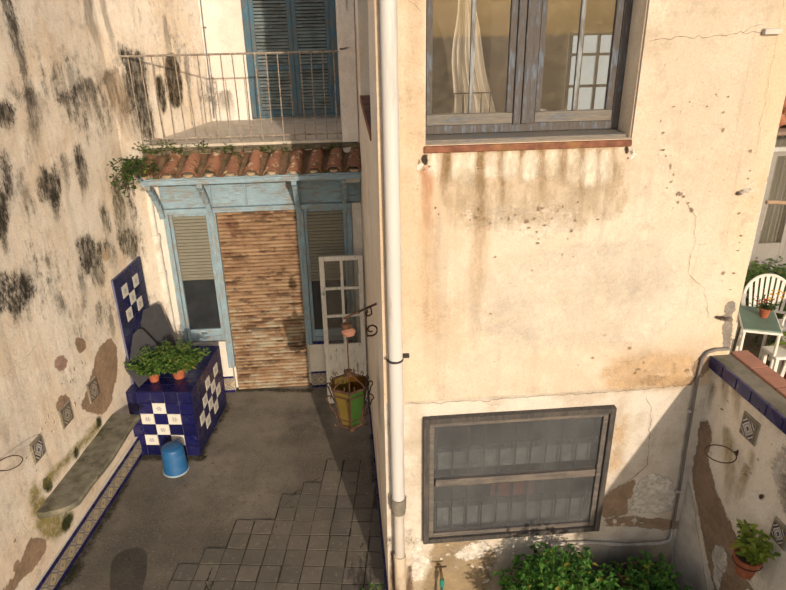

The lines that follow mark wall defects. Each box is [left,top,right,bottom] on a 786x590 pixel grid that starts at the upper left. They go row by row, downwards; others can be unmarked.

leakage [1,0,27,76]
leakage [117,42,186,142]
leakage [37,159,62,213]
leakage [429,150,609,193]
leakage [75,172,138,286]
peeling [41,337,118,432]
peeling [602,473,679,530]
peeling [692,420,754,590]
peeling [3,537,47,590]
peeling [411,539,429,582]
leakage [424,540,496,590]
peeling [440,540,492,583]